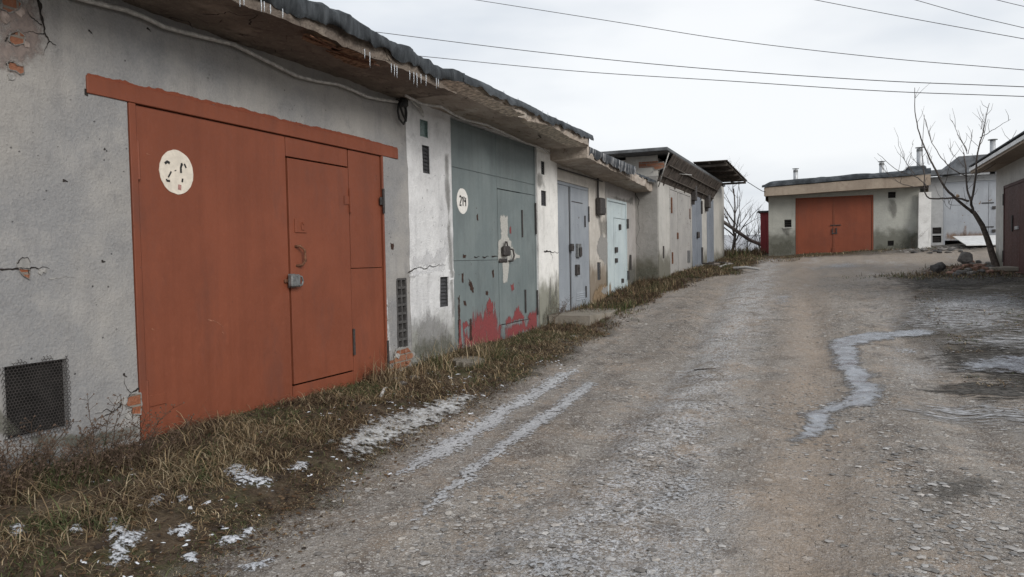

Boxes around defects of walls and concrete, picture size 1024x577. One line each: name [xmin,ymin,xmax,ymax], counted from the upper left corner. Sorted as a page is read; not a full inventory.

crack [24,0,55,55]
flaking render [6,61,25,81]
peeling [387,298,537,374]